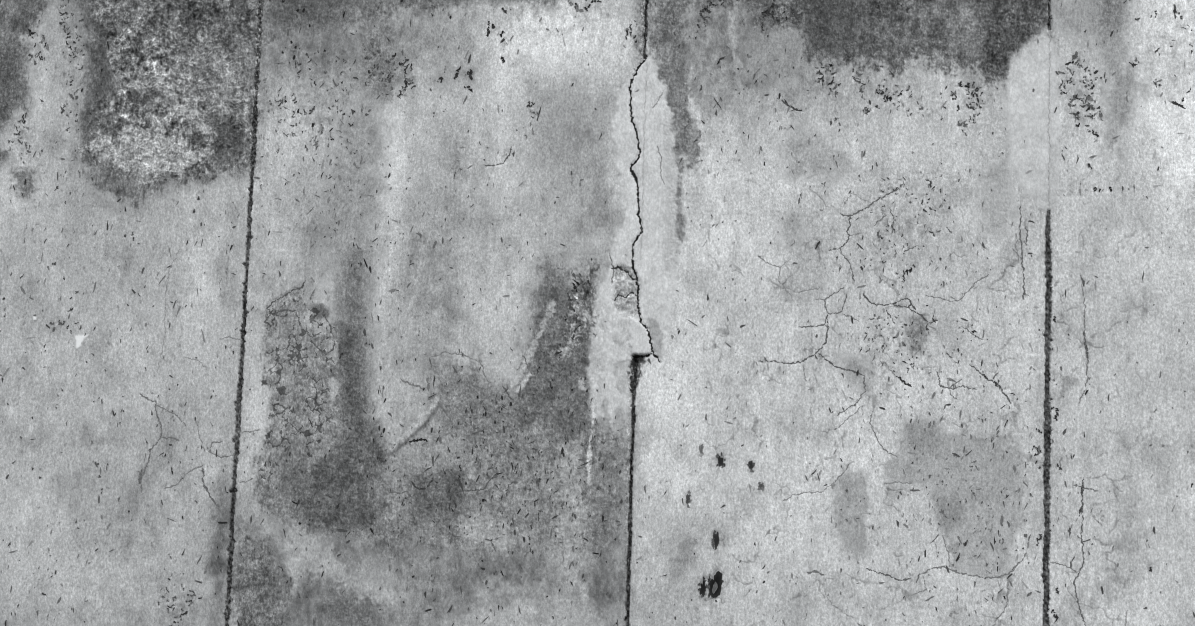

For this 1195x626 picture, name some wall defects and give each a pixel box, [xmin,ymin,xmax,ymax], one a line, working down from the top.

leakage [0,0,651,626]
crack [609,58,665,395]
crack [783,464,849,501]
crack [807,570,862,626]
leakage [836,353,875,395]
leakage [608,0,1152,269]
spalling [664,0,1103,626]
crack [758,179,1011,484]
leakage [897,308,937,362]
leakage [830,416,1029,581]
crack [866,477,1098,626]
crack [1012,31,1051,297]